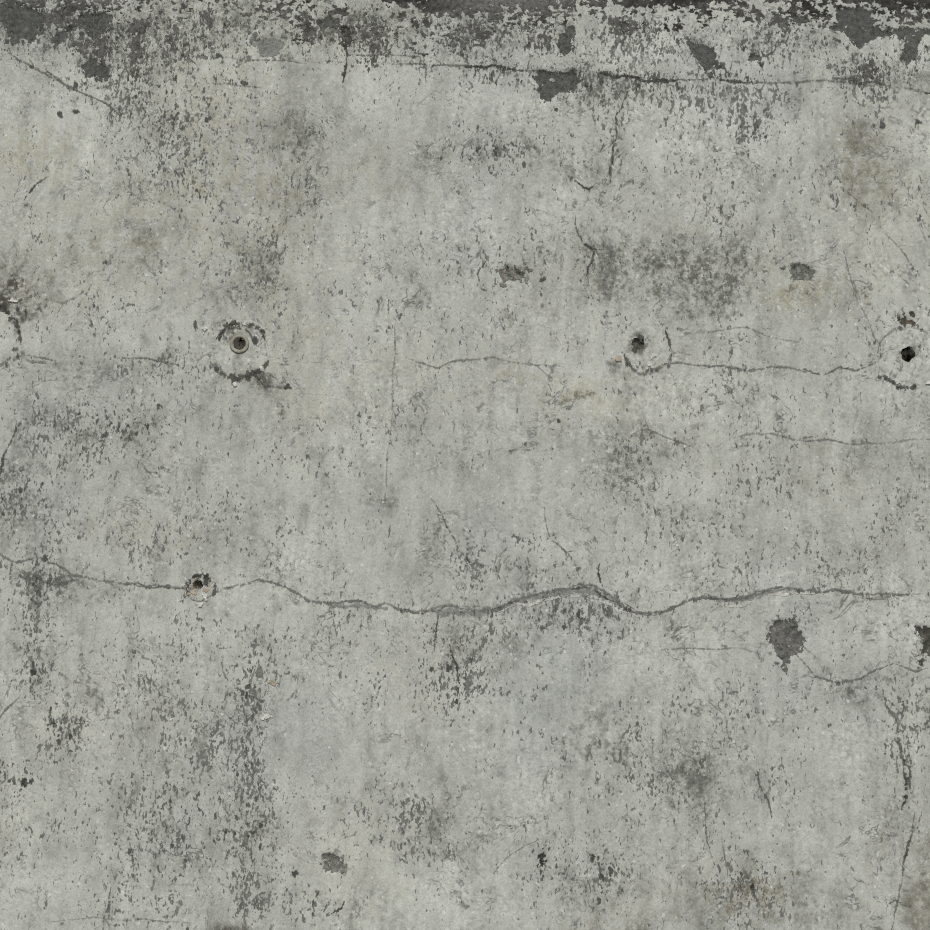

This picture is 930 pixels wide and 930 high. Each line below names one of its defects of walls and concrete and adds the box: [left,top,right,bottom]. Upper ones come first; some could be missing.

crack [330,18,440,82]
leakage [0,0,930,94]
peeling [547,25,577,57]
peeling [516,63,695,111]
peeling [676,36,765,94]
peeling [792,1,930,90]
crack [464,64,762,191]
crack [804,330,919,390]
crack [0,554,910,686]
spalling [766,611,807,674]
spalling [914,625,930,668]
crack [900,749,911,810]